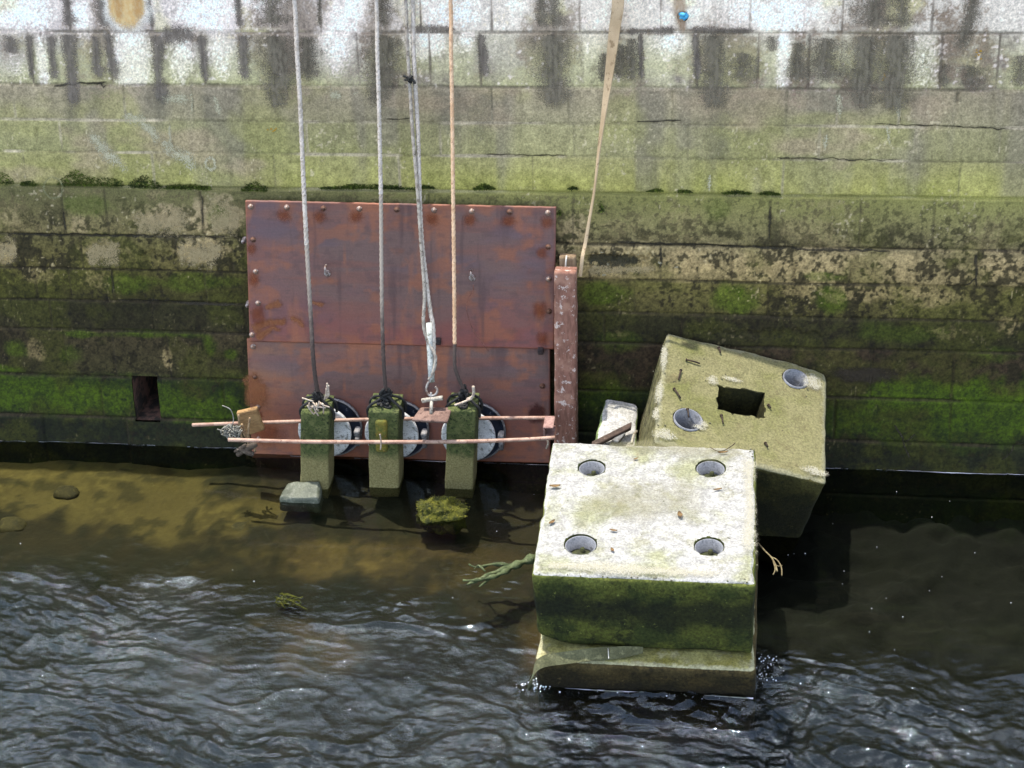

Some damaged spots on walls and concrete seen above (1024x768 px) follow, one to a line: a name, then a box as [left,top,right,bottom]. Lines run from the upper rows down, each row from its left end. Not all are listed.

leakage [2,0,119,104]
leakage [146,0,210,110]
leakage [234,0,324,108]
leakage [529,0,575,107]
leakage [595,26,674,81]
leakage [691,26,759,108]
leakage [786,0,925,116]
crack [778,155,892,163]
crack [876,110,1006,130]
rust [244,374,266,407]
rust [255,426,276,439]
rust [529,405,544,422]